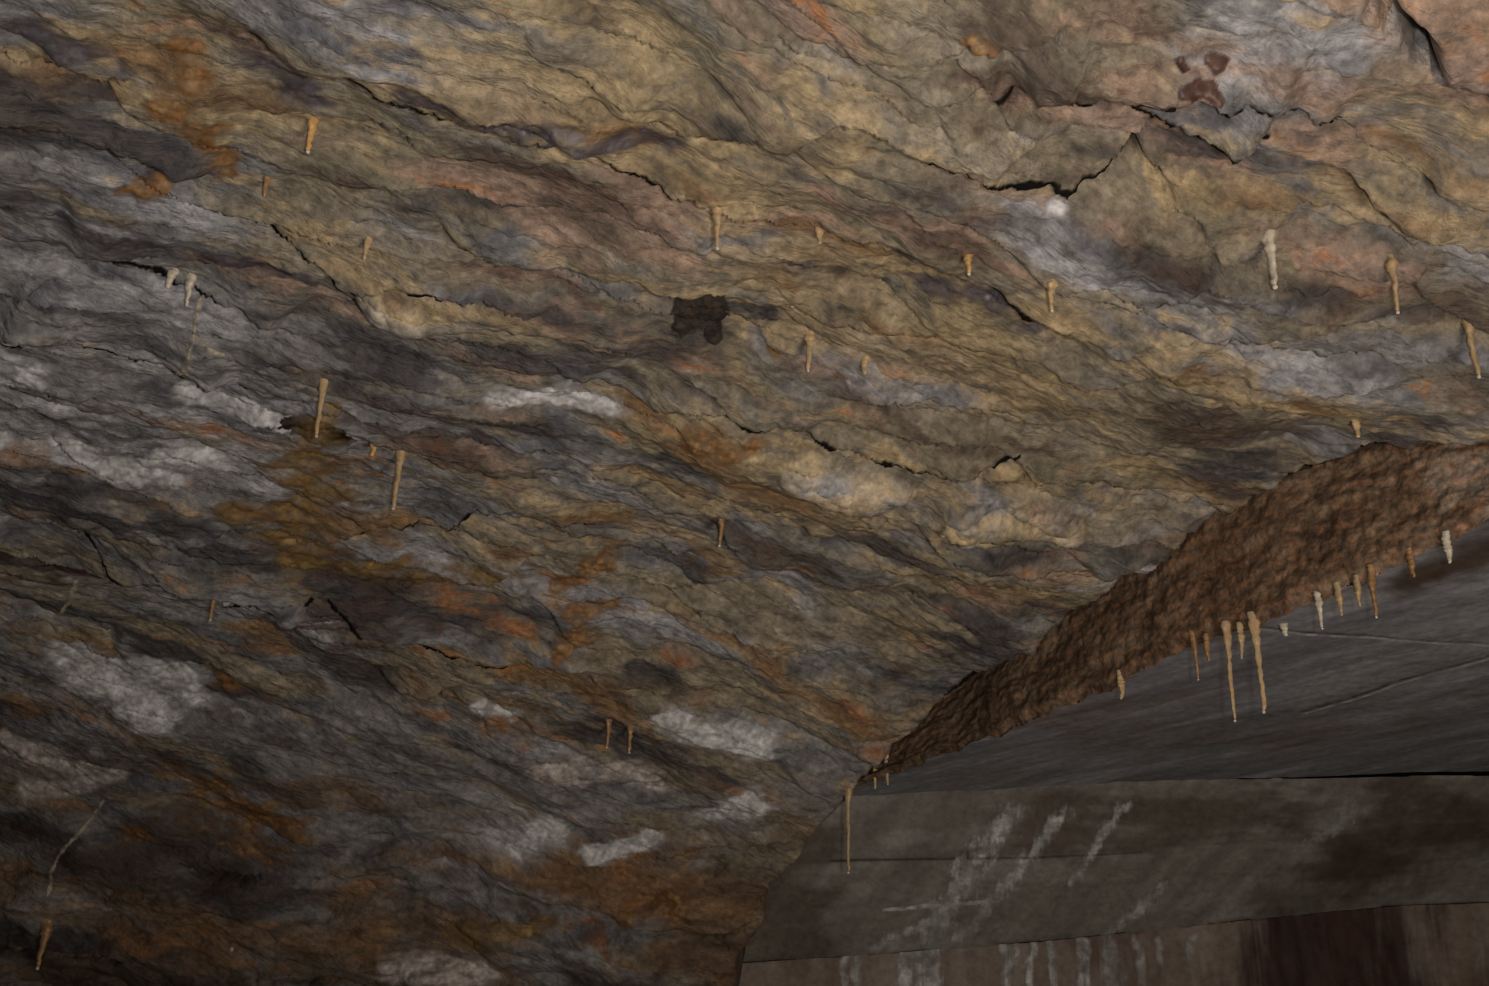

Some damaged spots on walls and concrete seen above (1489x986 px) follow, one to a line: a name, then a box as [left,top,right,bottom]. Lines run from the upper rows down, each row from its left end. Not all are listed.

water stain [1068,803,1130,885]
water stain [873,807,1066,986]
water stain [1076,884,1163,986]